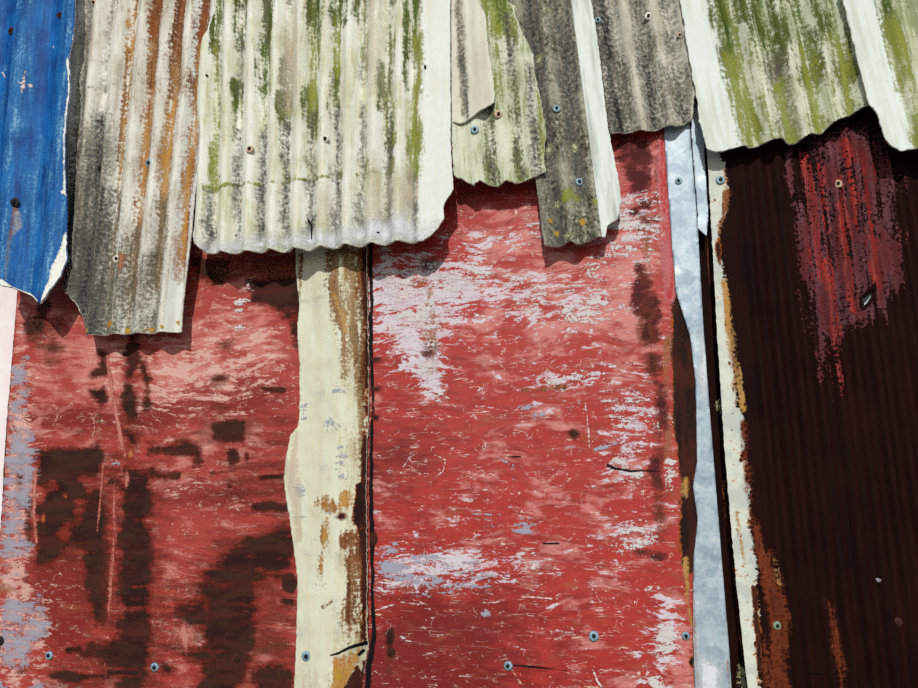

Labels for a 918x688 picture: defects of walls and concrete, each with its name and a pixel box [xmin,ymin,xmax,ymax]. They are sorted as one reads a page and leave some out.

rust [108,0,303,349]
water stain [209,0,247,253]
water stain [254,0,422,251]
peeling [503,190,664,334]
water stain [593,0,691,133]
water stain [725,0,858,145]
peeling [783,120,909,400]
rust [18,325,181,688]
rust [175,526,297,688]
rust [314,243,395,688]
peeling [546,369,659,429]
peeling [607,519,658,559]